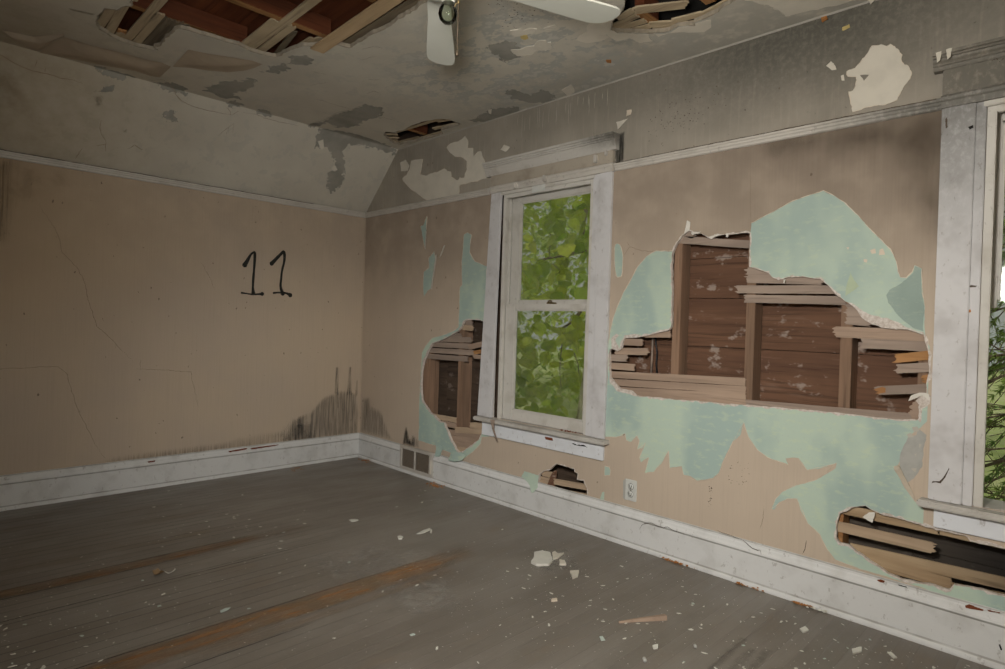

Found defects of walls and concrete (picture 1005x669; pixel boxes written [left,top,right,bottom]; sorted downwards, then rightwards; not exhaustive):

peeling [826,44,912,112]
peeling [308,104,487,200]
spalling [418,232,500,461]
peeling [605,190,1005,613]
spalling [538,463,588,495]